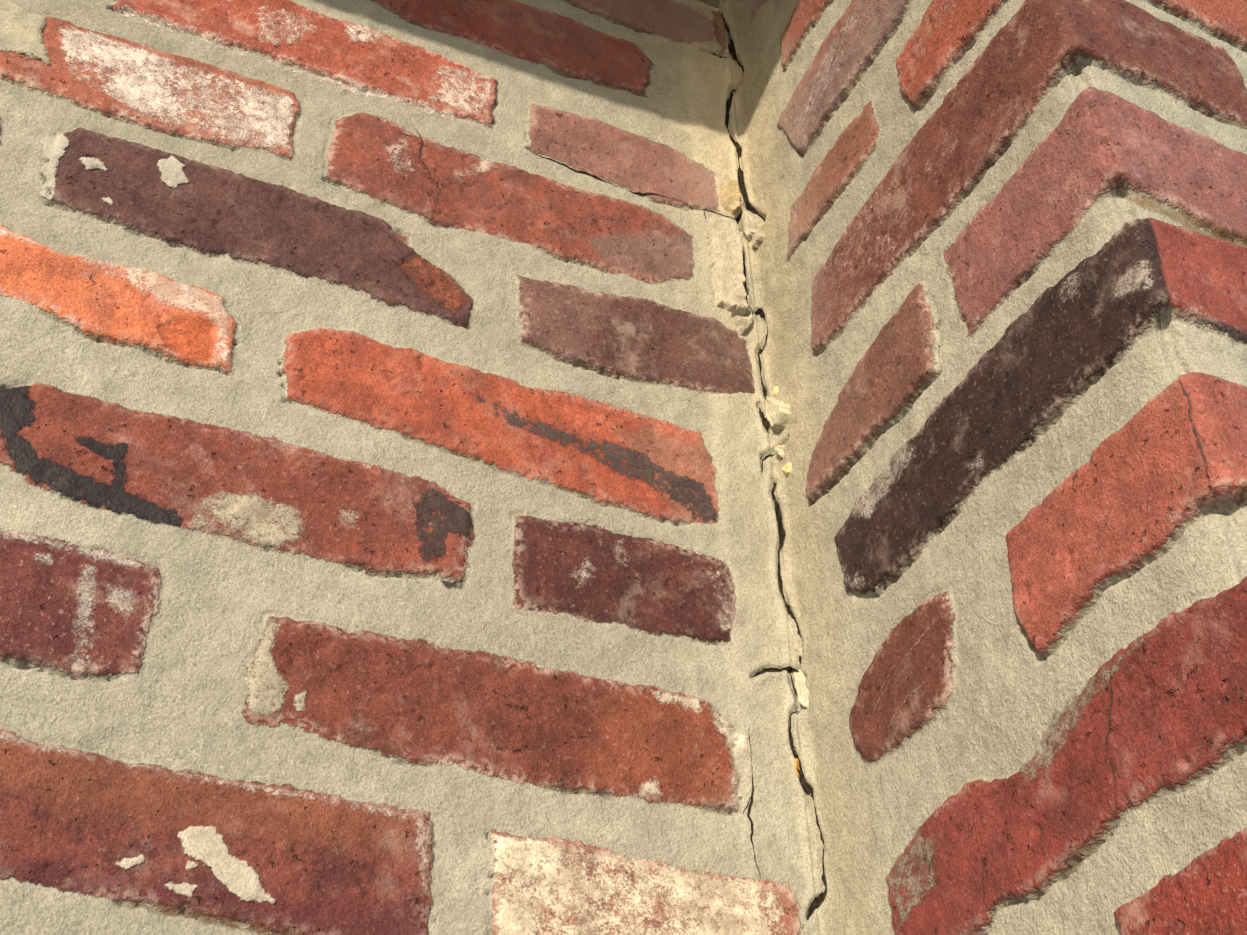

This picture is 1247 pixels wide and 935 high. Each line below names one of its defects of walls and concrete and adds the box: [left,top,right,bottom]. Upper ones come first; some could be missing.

leakage [118,6,221,45]
leakage [258,6,316,43]
leakage [345,25,381,43]
leakage [60,28,293,149]
leakage [267,60,491,126]
crack [525,6,765,244]
peeling [79,157,107,171]
crack [743,254,827,920]
peeling [116,854,145,869]
peeling [164,861,198,897]